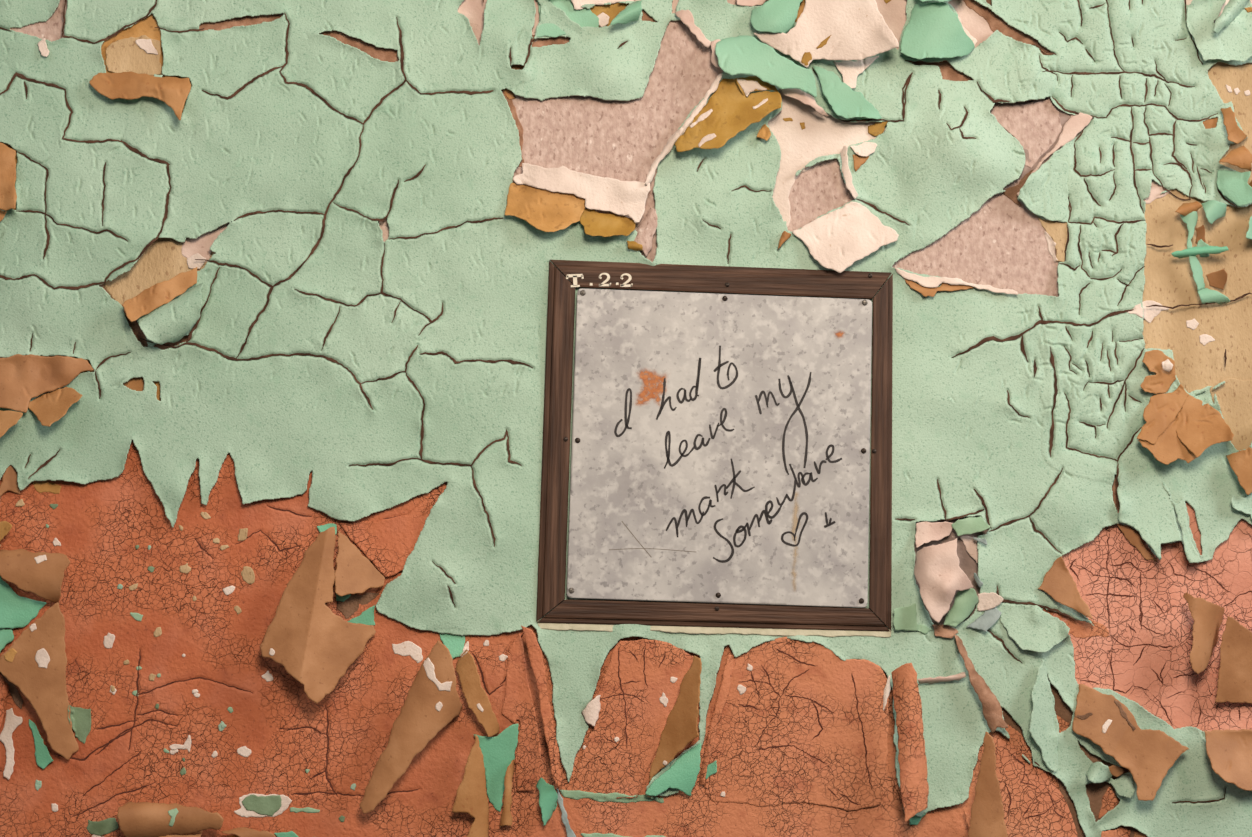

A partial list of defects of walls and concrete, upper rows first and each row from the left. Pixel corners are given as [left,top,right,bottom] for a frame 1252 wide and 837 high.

peeling [0,521,79,791]
crack [25,449,60,479]
crack [0,72,172,290]
crack [61,0,204,44]
crack [73,13,533,547]
peeling [260,483,448,704]
peeling [350,516,1189,837]
peeling [501,0,1054,273]
crack [838,72,1010,139]
peeling [892,97,1094,297]
crack [896,0,1252,727]
peeling [1112,0,1252,563]